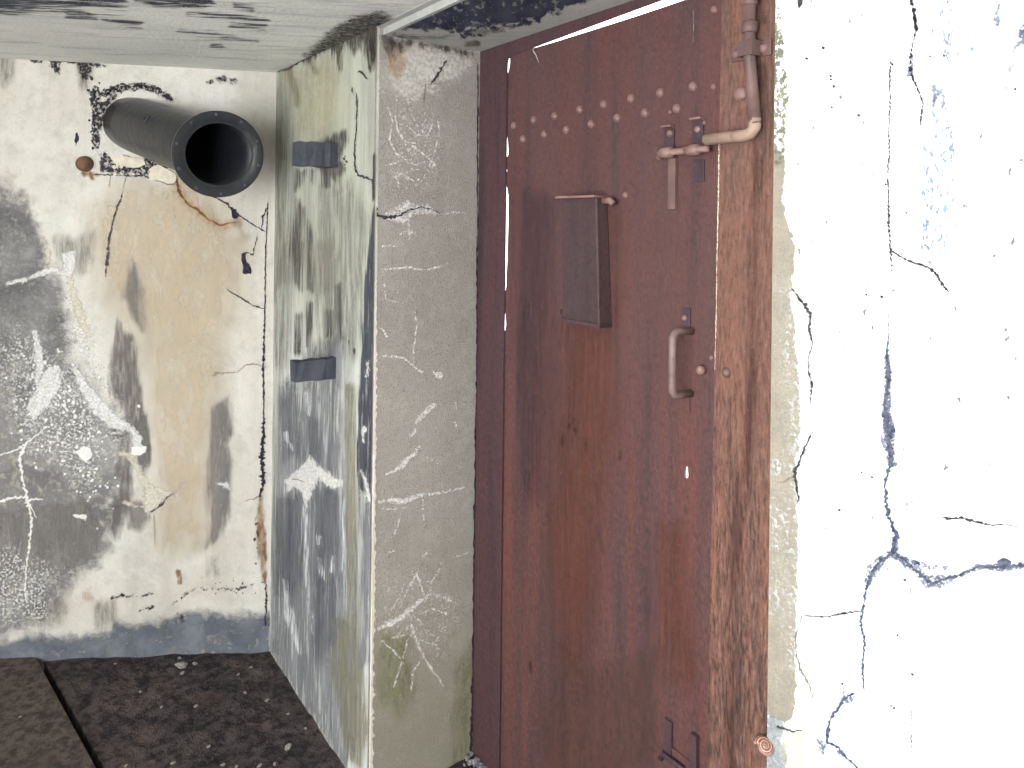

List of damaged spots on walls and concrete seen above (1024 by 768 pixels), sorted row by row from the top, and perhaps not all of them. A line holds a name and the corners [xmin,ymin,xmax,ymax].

flaking render [74,64,177,185]
crack [105,174,126,277]
flaking render [10,355,172,512]
crack [176,179,268,501]
rust [253,498,267,584]
crack [262,584,270,626]
leakage [0,0,586,767]
crack [351,60,479,757]
crack [778,431,813,502]
crack [791,0,1024,768]